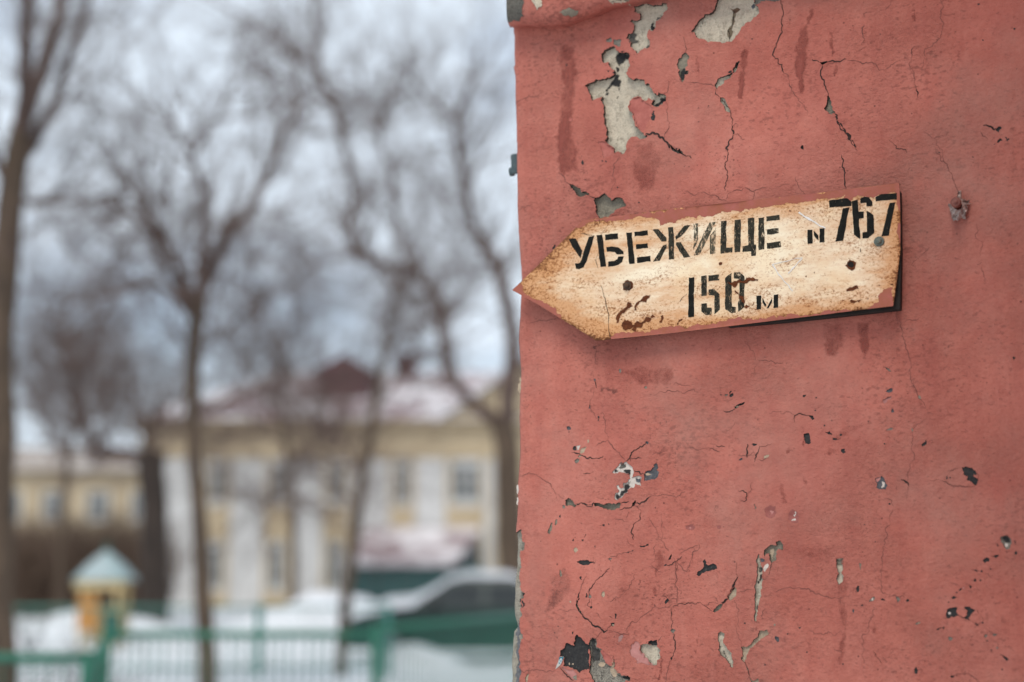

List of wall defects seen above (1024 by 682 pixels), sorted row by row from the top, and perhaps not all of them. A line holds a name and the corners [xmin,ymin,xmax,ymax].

peeling [693,0,780,43]
peeling [559,0,668,218]
crack [646,63,805,200]
crack [772,0,944,187]
peeling [548,440,662,534]
crack [559,311,925,679]
peeling [934,467,979,487]
peeling [554,626,630,682]
peeling [610,614,662,666]
peeling [718,541,801,682]